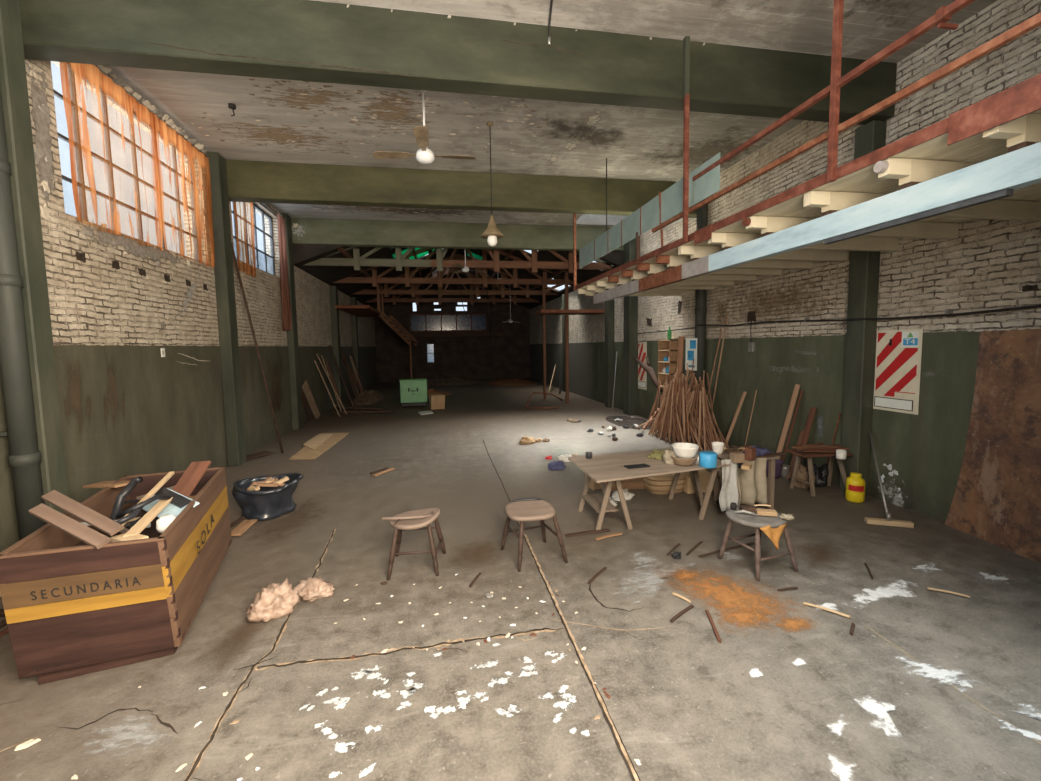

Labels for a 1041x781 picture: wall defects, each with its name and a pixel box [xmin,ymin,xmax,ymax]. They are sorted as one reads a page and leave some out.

peeling [96,65,440,157]
leakage [549,110,623,165]
leakage [648,127,750,168]
crack [184,439,670,781]
crack [0,708,185,752]